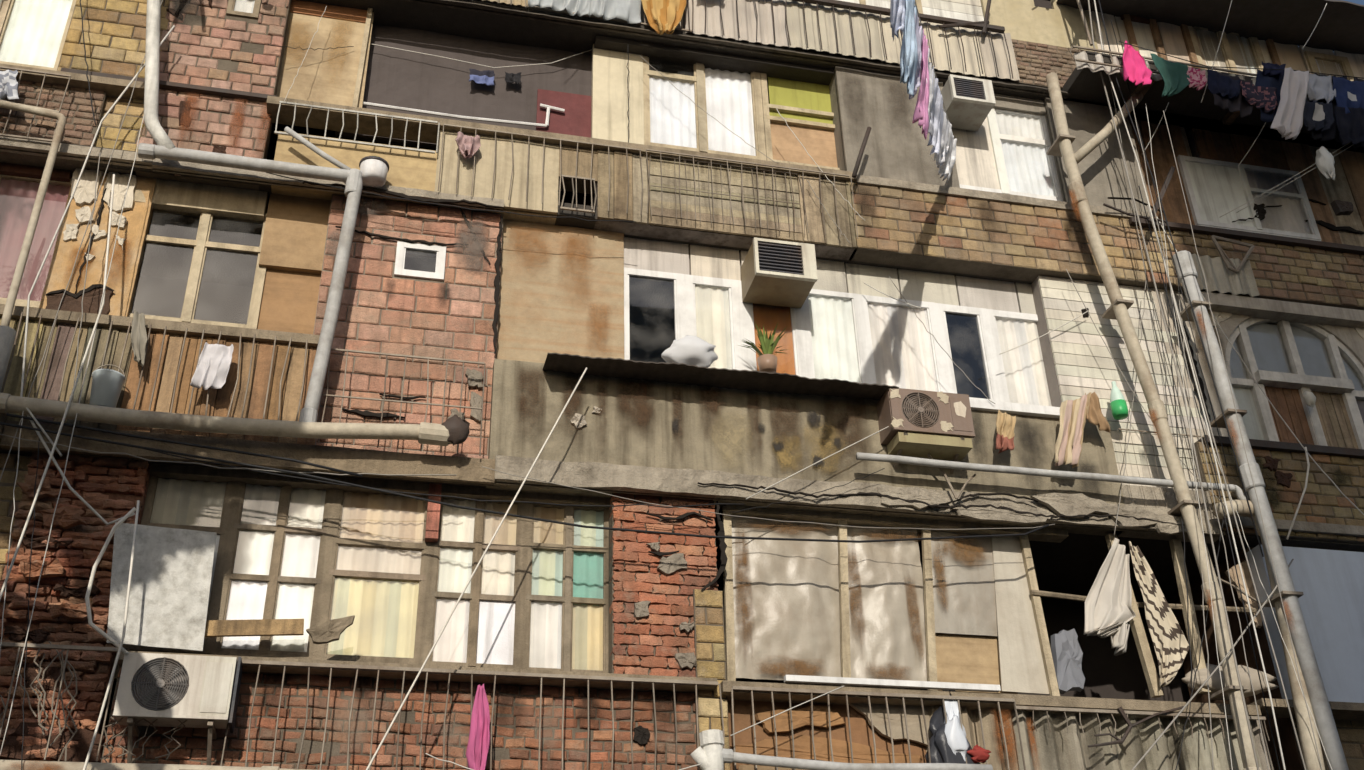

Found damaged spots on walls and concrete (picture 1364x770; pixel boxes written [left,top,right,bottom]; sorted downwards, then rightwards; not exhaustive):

flaking render [63,168,137,262]
flaking render [45,284,114,315]
spalling [4,478,101,698]
peeling [646,542,687,575]
leakage [736,522,824,639]
leakage [848,555,863,629]
crack [646,482,1182,591]
leakage [906,583,923,651]
leakage [761,659,820,676]
leakage [871,667,906,679]
spalling [0,722,106,763]